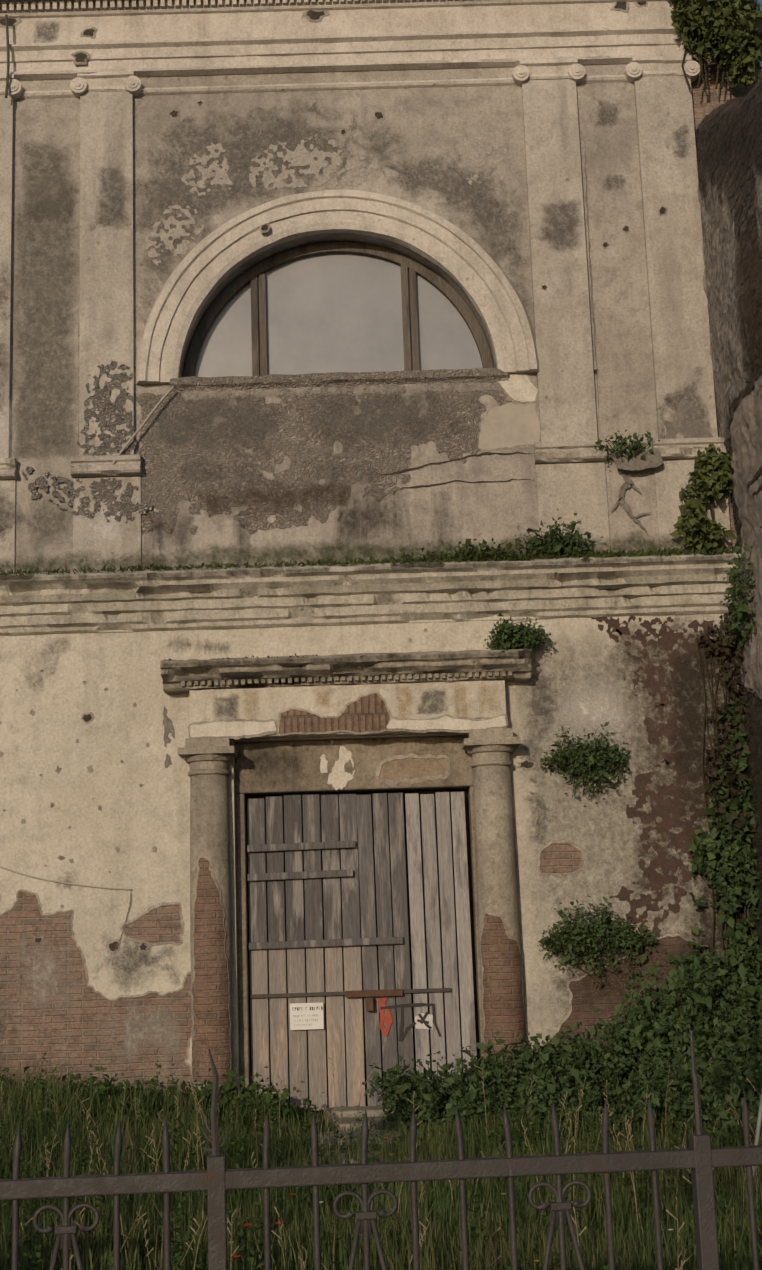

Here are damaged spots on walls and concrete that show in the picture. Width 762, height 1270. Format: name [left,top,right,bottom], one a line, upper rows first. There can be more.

spalling [0,855,232,1104]